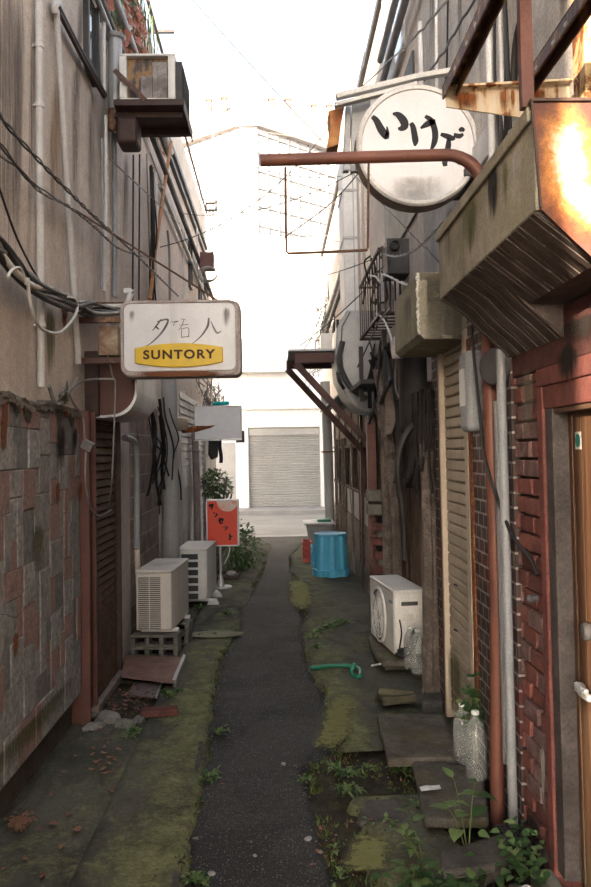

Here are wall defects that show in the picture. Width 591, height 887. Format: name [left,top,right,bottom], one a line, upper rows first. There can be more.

rust [456,92,476,106]